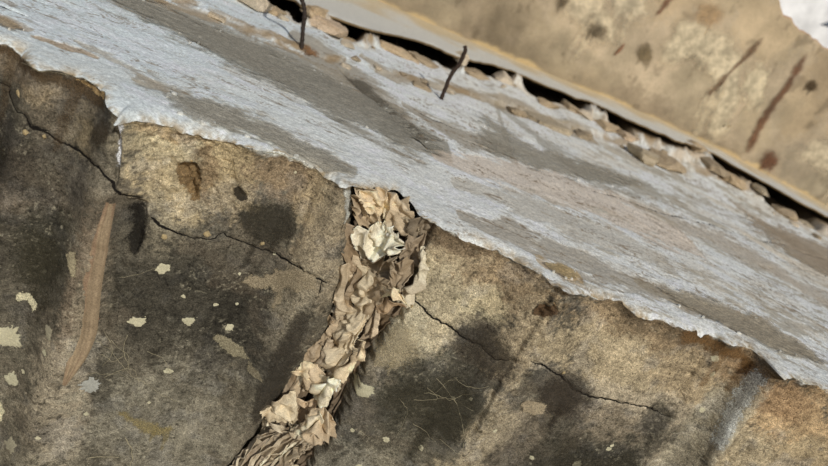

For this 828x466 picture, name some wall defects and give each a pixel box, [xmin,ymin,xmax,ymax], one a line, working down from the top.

peeling [115,0,452,155]
crack [0,82,142,198]
peeling [163,91,355,173]
peeling [472,112,644,187]
crack [151,217,327,293]
leakage [233,196,297,247]
crack [410,300,475,344]
leakage [459,326,520,383]
leakage [536,378,588,419]
crack [511,359,673,418]
leakage [681,331,767,450]
peeling [659,287,828,364]